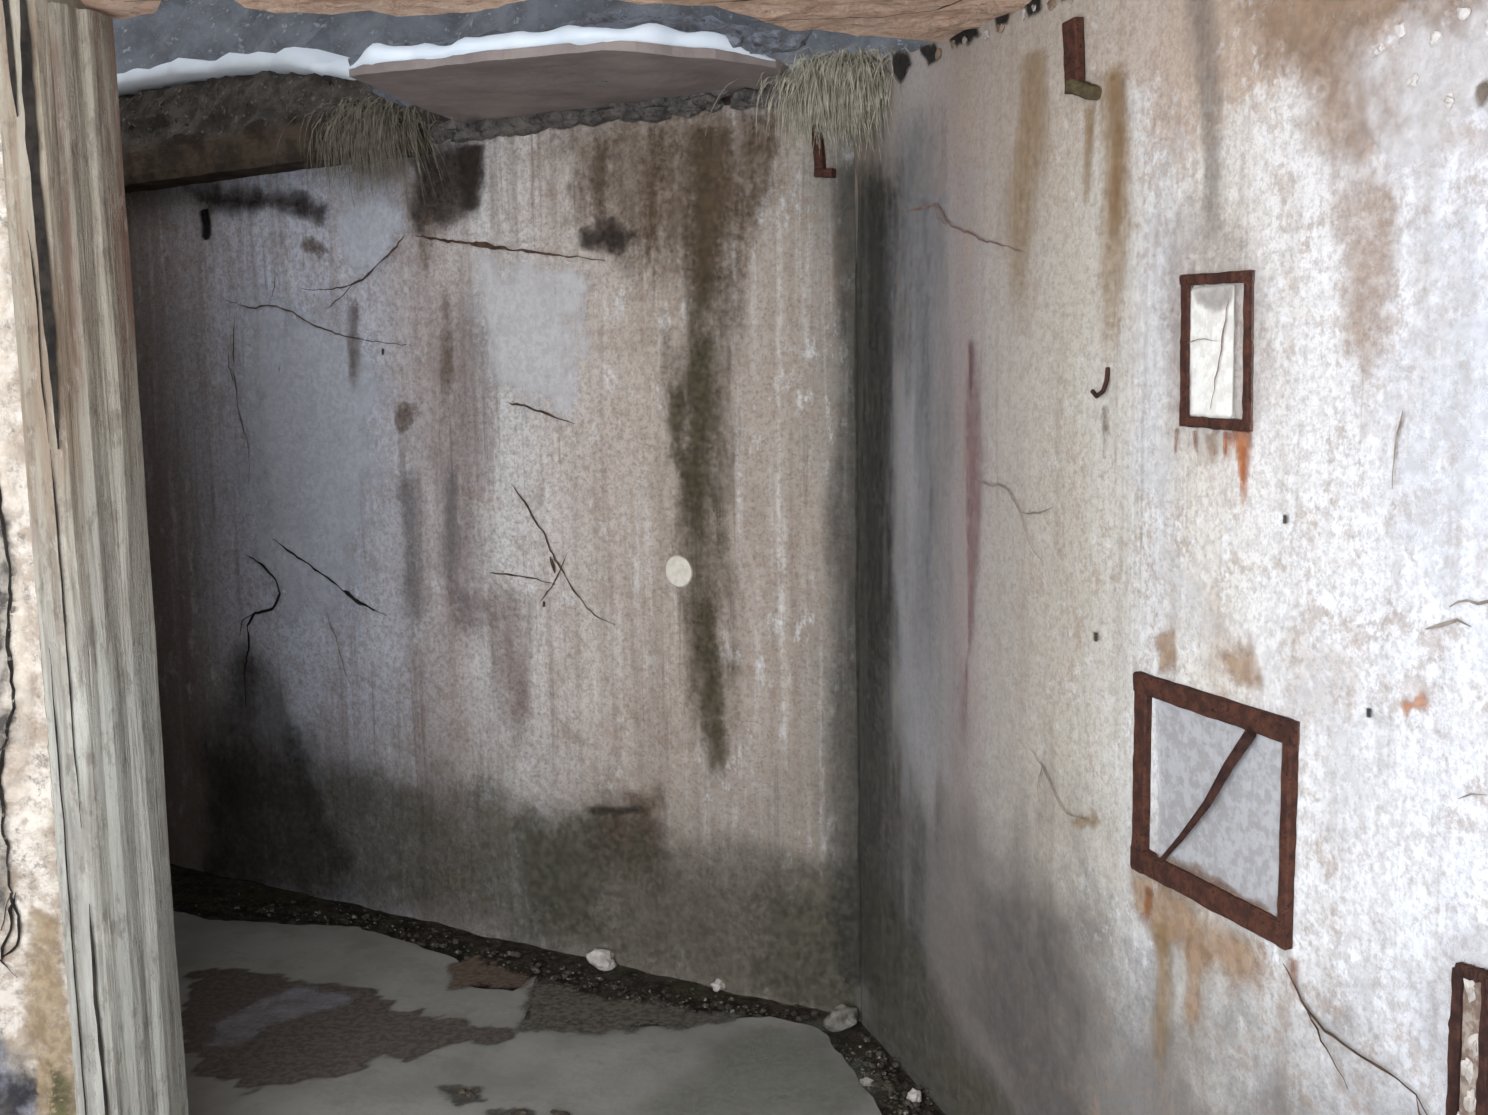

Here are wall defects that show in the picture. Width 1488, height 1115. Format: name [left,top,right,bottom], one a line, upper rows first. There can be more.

water stain [196,144,482,278]
water stain [580,119,770,256]
corrosion [1086,74,1126,240]
crack [225,235,605,485]
corrosion [1175,429,1250,491]
crack [0,0,108,1115]
crack [239,539,387,707]
crack [493,485,615,625]
water stain [836,170,900,980]
crack [1425,599,1488,630]
corrosion [1133,876,1257,1035]
crack [1283,964,1428,1115]